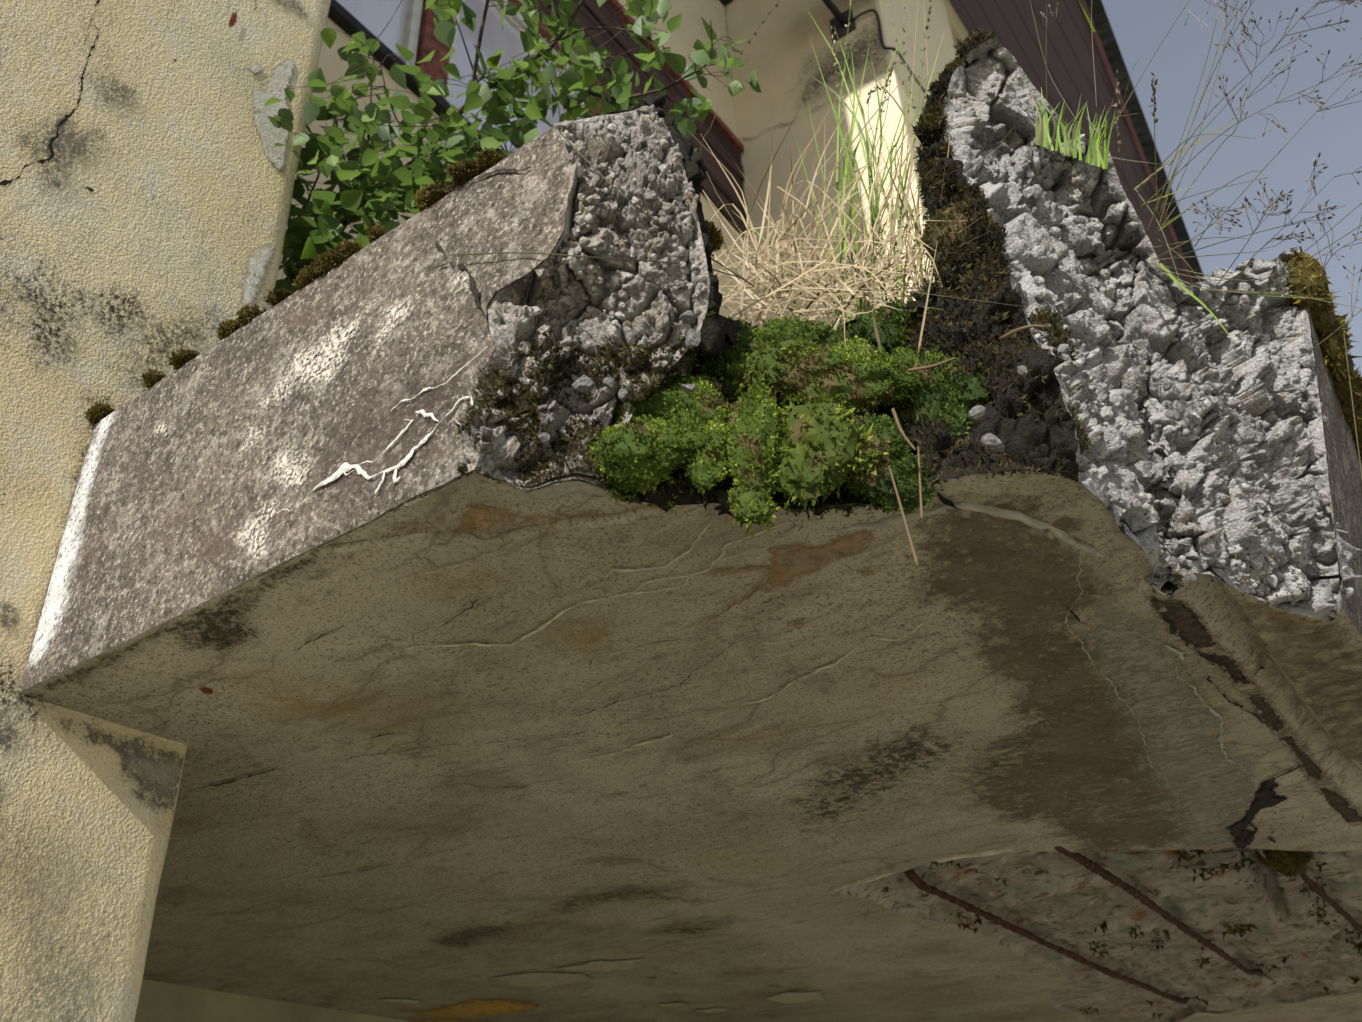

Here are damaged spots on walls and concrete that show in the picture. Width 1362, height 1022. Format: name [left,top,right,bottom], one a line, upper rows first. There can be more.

crack [0,0,101,186]
peeling [247,59,295,171]
damp [29,391,121,665]
damp [0,260,233,388]
damp [0,550,319,722]
peeling [240,243,276,310]
damp [237,298,488,559]
spalling [459,104,710,501]
damp [568,497,1256,853]
spalling [943,37,1362,826]
spalling [834,782,1362,1022]